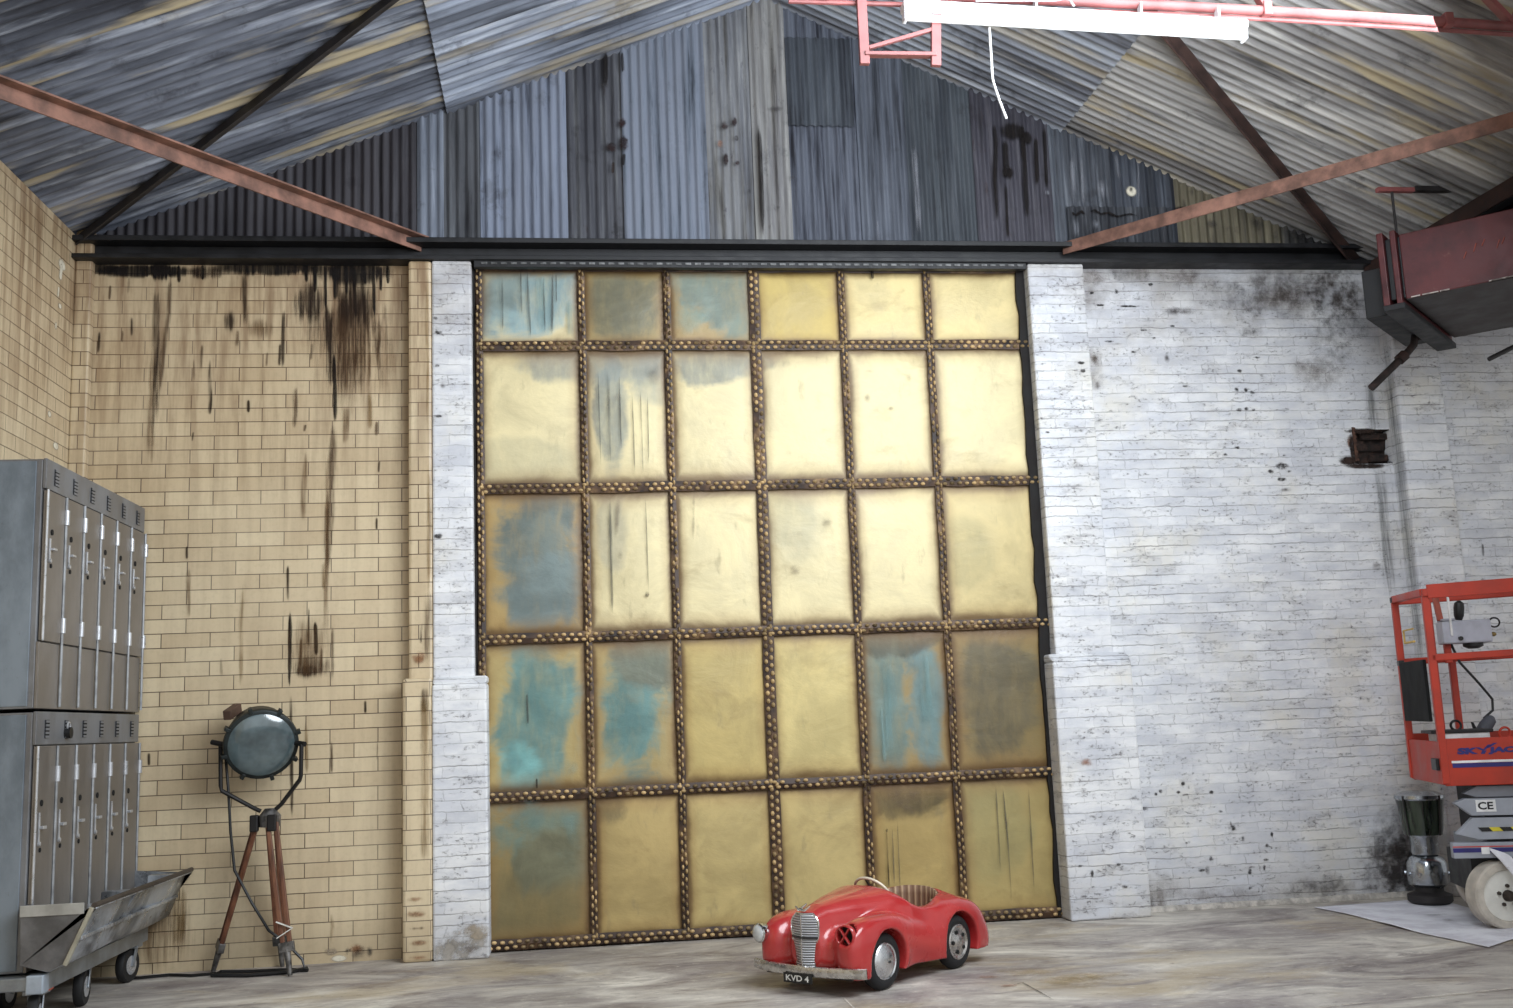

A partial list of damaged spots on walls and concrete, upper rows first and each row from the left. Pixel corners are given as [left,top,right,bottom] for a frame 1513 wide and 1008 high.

leakage [153,289,171,390]
leakage [225,276,380,593]
leakage [288,615,333,684]
leakage [1381,835,1412,886]